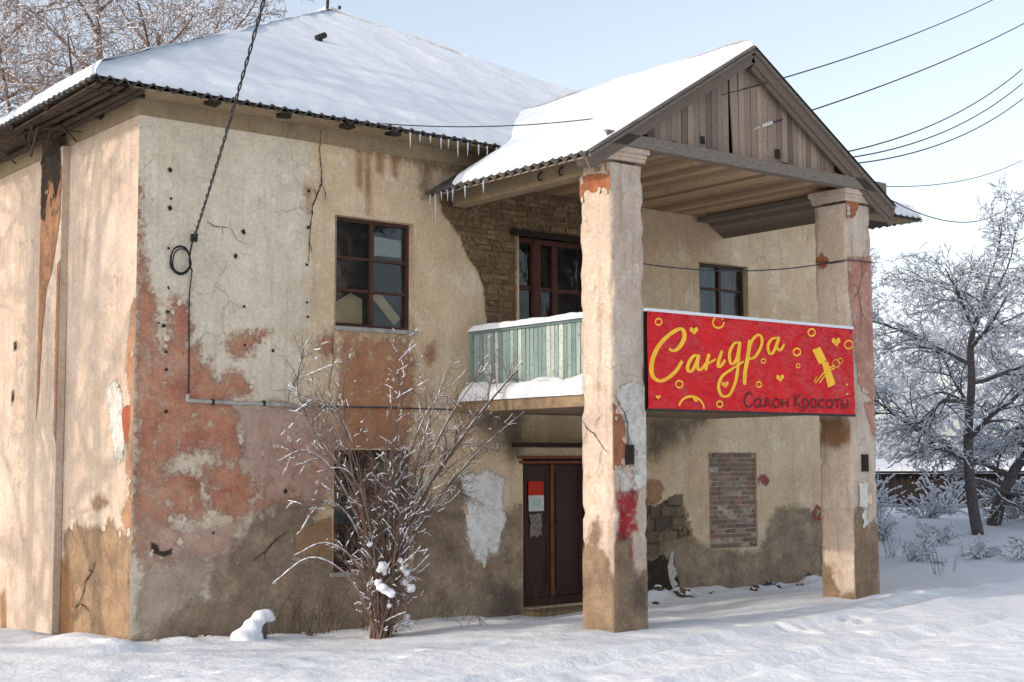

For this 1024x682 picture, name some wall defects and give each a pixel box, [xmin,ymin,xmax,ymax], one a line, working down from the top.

flaking render [36,137,62,443]
peeling [62,209,415,640]
crack [308,131,326,262]
flaking render [440,166,610,323]
peeling [613,380,693,592]
water stain [582,506,880,633]
spalling [846,200,870,220]
peeling [847,252,876,436]